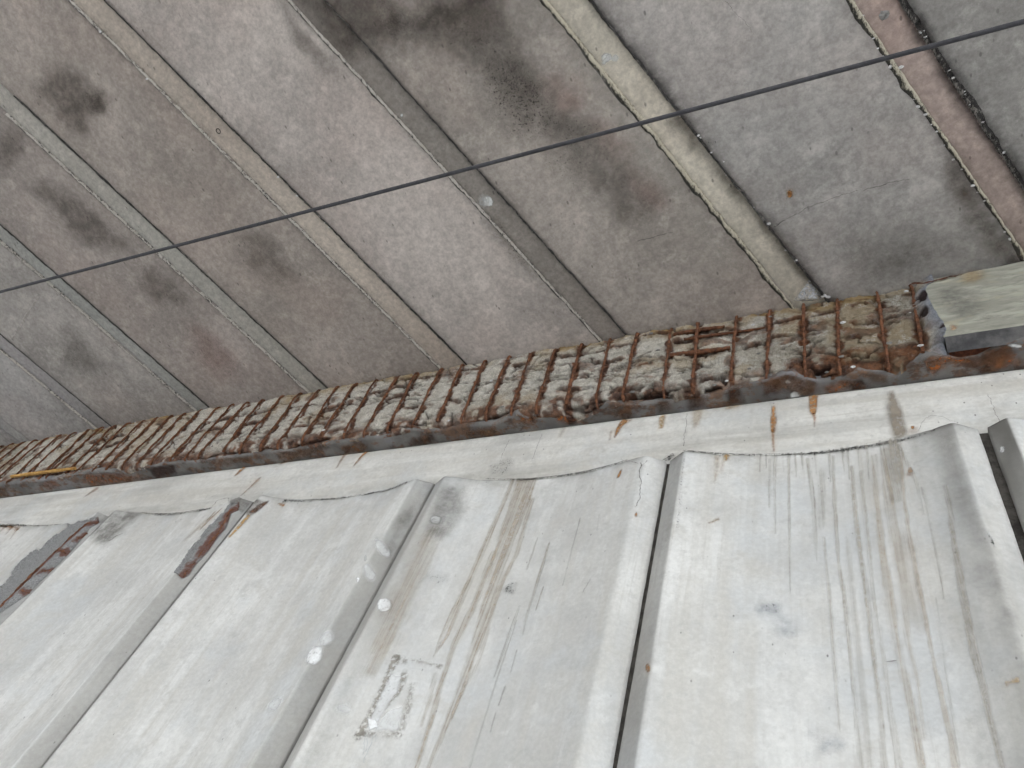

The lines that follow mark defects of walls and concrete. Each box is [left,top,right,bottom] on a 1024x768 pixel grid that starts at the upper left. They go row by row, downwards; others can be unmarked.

spalling [0,274,947,484]